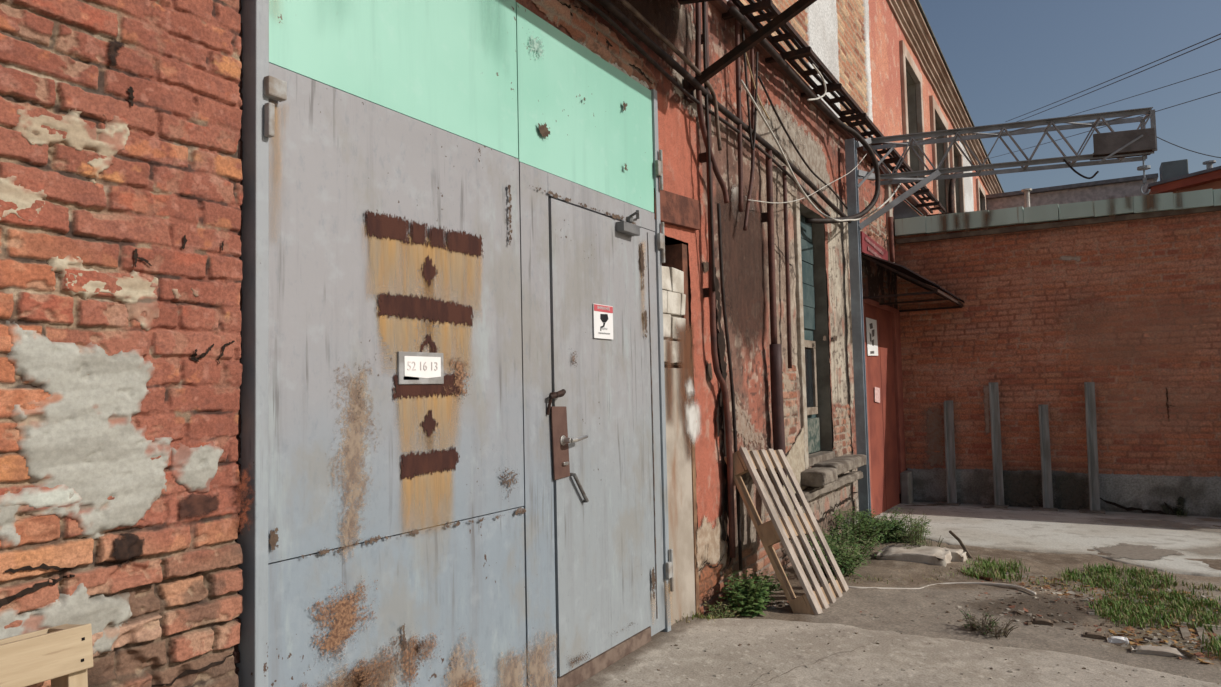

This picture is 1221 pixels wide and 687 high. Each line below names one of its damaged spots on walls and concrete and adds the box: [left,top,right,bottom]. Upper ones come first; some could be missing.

spalling [12,108,130,184]
spalling [0,175,47,221]
peeling [732,393,768,449]
flaking render [782,365,799,454]
peeling [0,484,82,509]
peeling [168,442,224,519]
corrosion [332,366,374,554]
peeling [696,515,728,599]
corrosion [302,576,558,687]